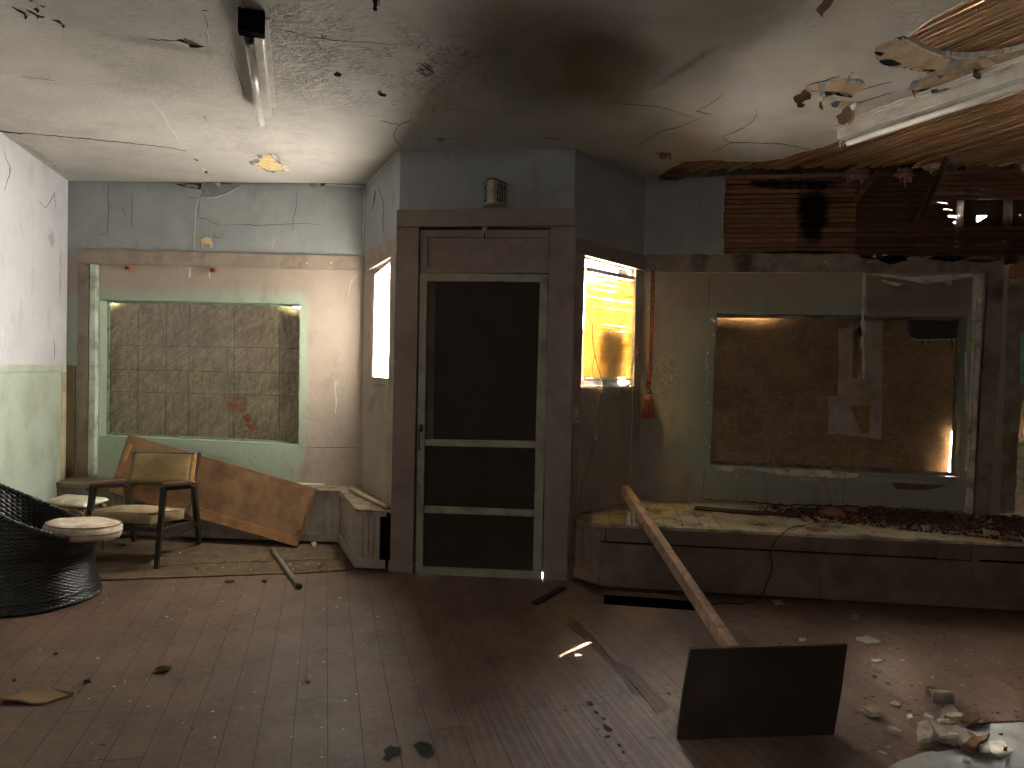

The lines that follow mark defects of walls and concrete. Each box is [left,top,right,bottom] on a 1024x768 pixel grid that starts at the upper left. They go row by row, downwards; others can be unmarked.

peeling [816,0,834,18]
flaking render [873,36,1024,99]
crack [0,104,185,190]
flaking render [249,154,289,173]
crack [602,94,723,147]
crack [713,105,808,151]
peeling [793,75,893,125]
crack [190,197,320,249]
water stain [749,179,846,255]